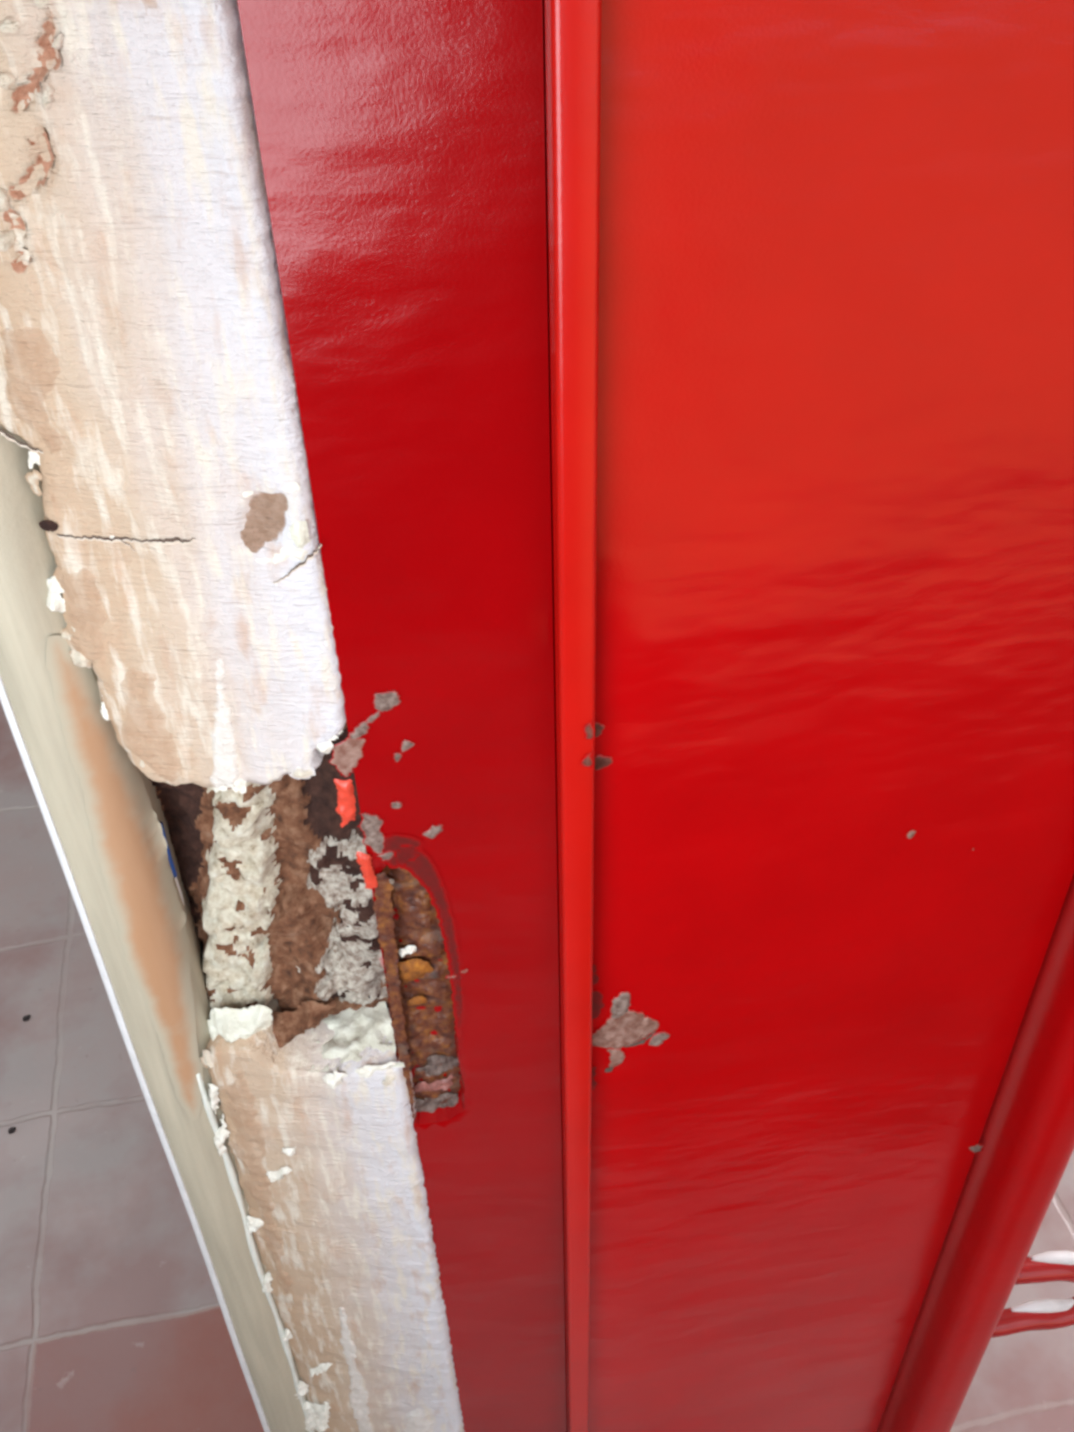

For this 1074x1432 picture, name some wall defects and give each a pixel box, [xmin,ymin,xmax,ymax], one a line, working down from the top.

spalling [25,451,43,496]
crack [57,534,196,552]
spalling [236,482,310,564]
crack [273,544,322,584]
spalling [47,576,92,668]
peeling [393,739,416,763]
peeling [422,824,445,839]
spalling [140,691,405,1156]
corrosion [373,833,466,1118]
peeling [592,991,671,1073]
peeling [266,1147,296,1182]
peeling [295,1363,333,1432]